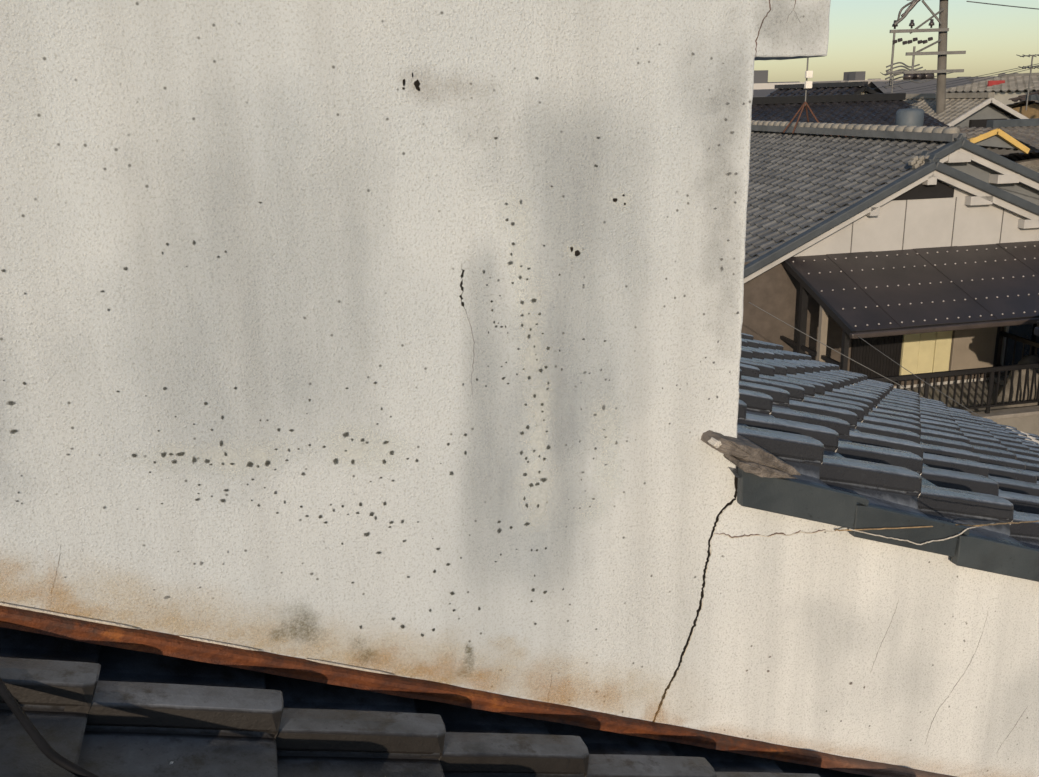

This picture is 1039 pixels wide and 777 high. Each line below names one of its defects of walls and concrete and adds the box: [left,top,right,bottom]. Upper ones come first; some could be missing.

crack [755,0,799,52]
crack [459,269,475,394]
damp [149,441,234,473]
damp [488,299,560,508]
crack [652,477,835,722]